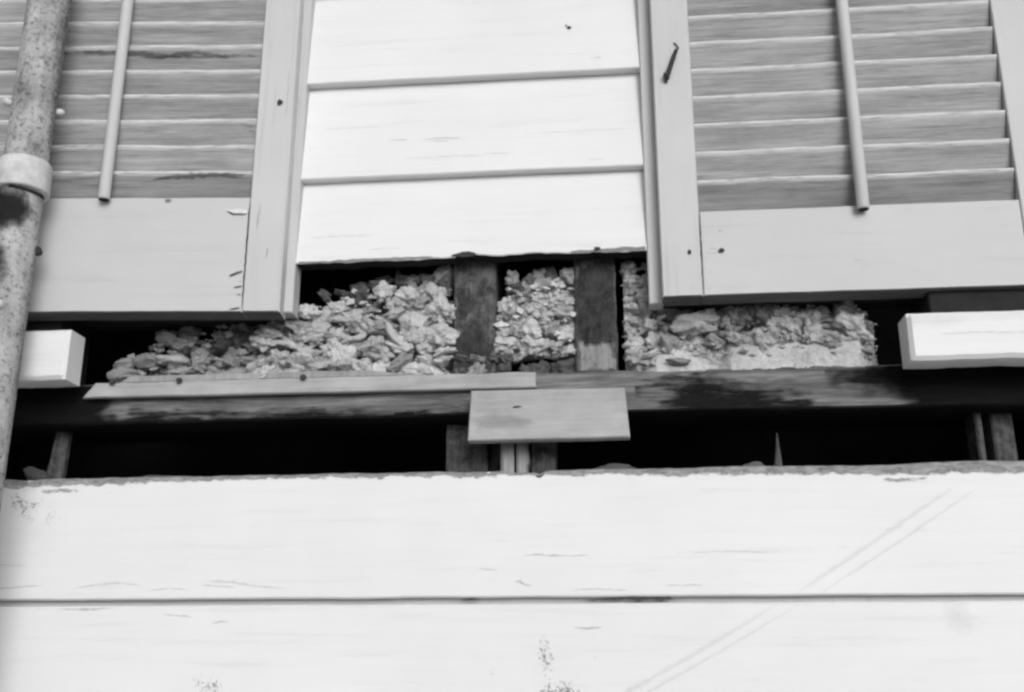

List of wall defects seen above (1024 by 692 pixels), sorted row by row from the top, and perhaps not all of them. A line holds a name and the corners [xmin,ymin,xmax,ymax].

water stain [635,371,813,410]
peeling [4,461,1024,493]